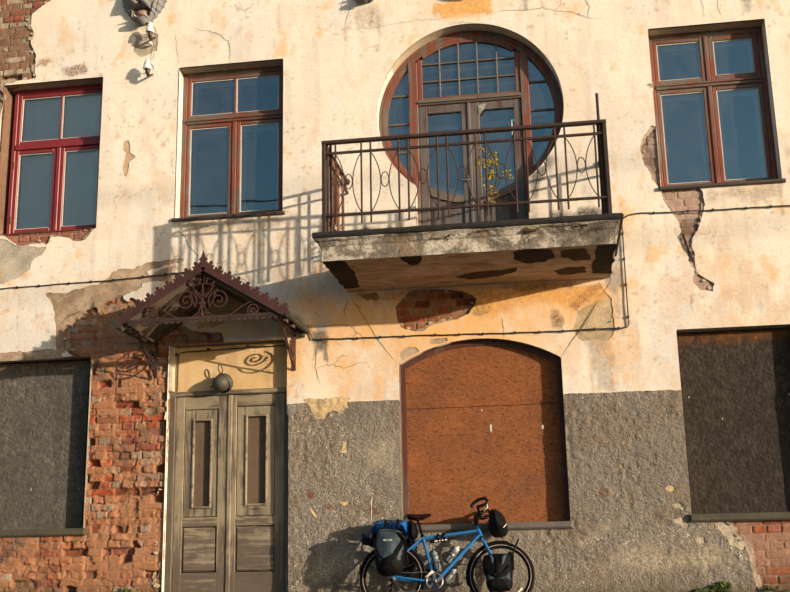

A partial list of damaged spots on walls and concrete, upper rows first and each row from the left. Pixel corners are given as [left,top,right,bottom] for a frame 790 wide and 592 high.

leakage [434,0,492,18]
flaking render [0,0,51,135]
peeling [122,140,135,177]
flaking render [640,125,714,291]
peeling [0,228,93,284]
spalling [323,261,380,301]
crack [312,296,397,382]
flaking render [396,289,490,332]
peeling [456,244,617,341]
flaking render [0,259,251,592]
peeling [304,396,351,420]
flaking render [715,520,790,592]